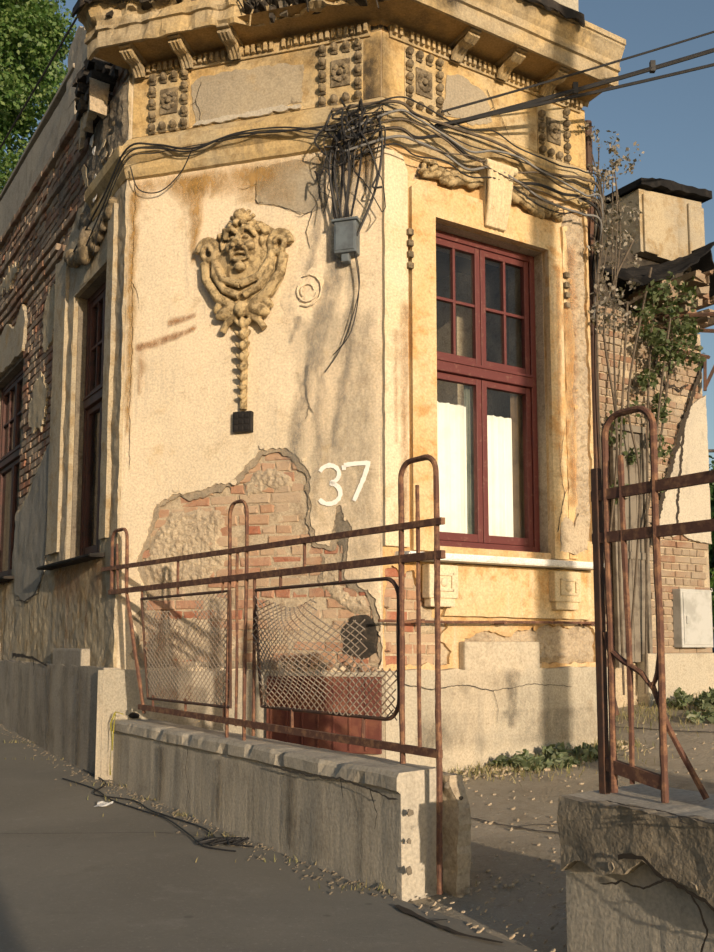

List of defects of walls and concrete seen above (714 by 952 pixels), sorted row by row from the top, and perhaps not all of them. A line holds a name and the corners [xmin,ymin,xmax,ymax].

spalling [105,0,195,18]
spalling [238,0,322,26]
spalling [81,81,128,188]
spalling [77,195,97,230]
spalling [560,210,591,555]
spalling [129,442,443,672]
spalling [465,619,594,664]
crack [273,765,397,829]
crack [600,853,714,952]